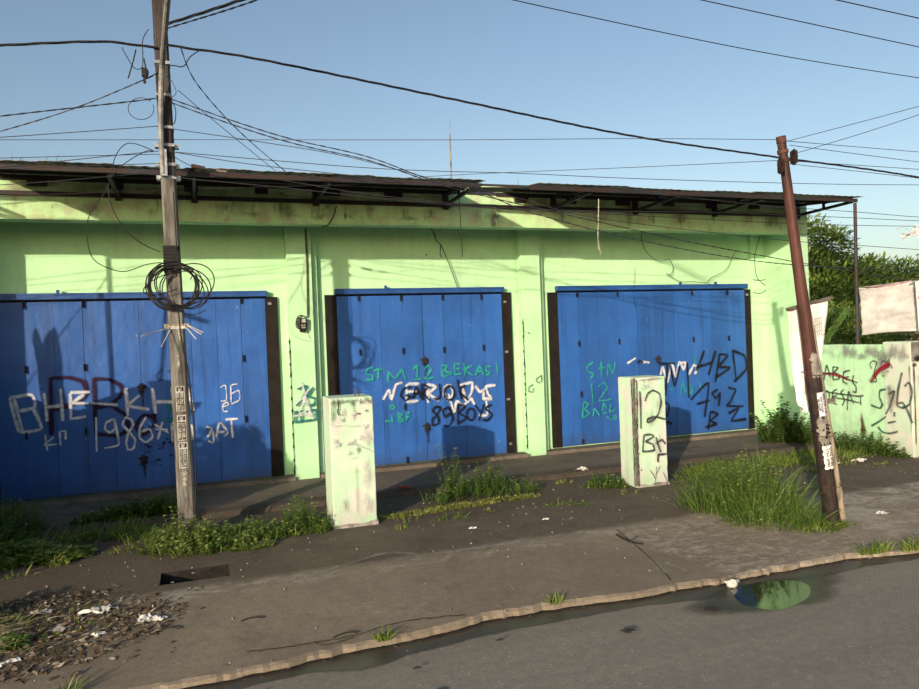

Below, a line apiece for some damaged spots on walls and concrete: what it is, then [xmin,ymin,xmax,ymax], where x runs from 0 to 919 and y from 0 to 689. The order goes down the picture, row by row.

leakage [844,347,919,444]